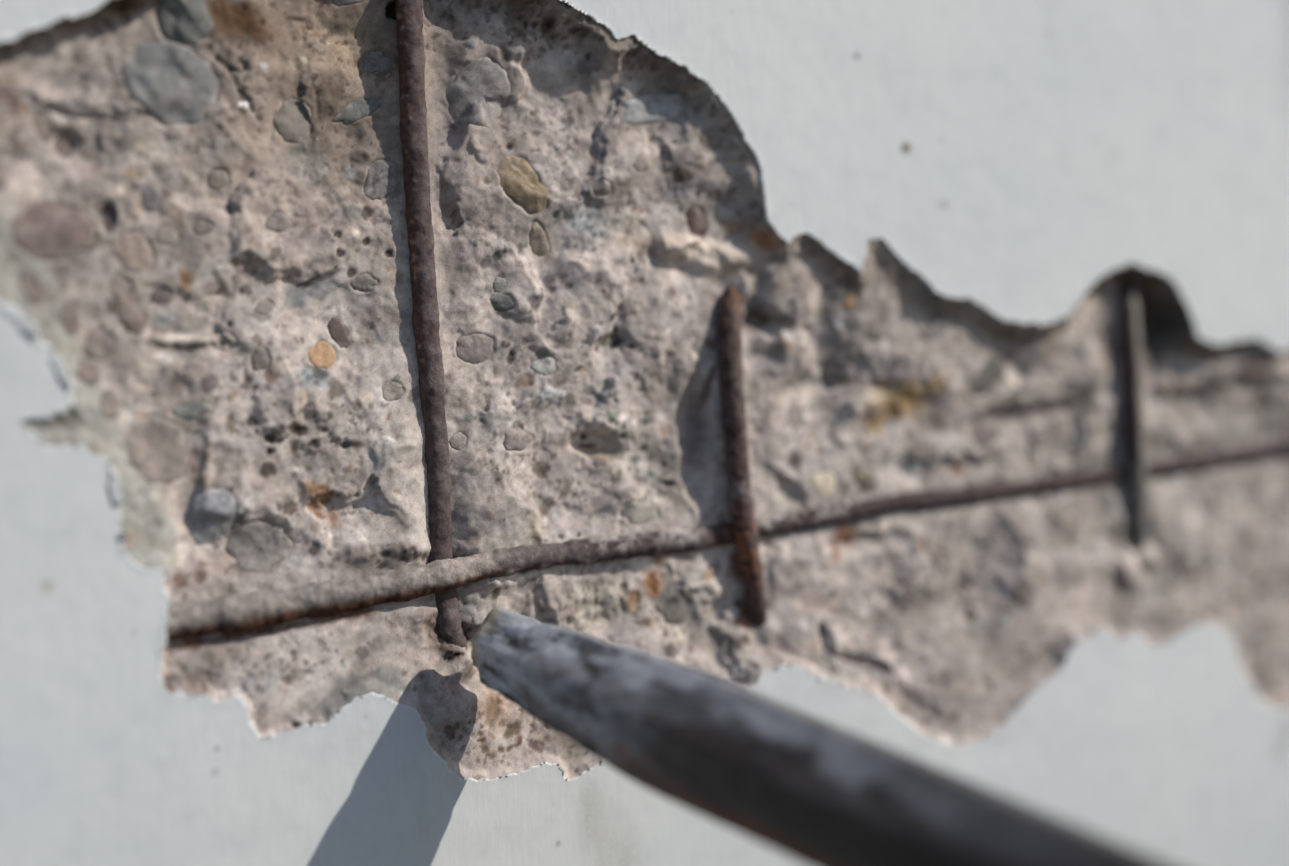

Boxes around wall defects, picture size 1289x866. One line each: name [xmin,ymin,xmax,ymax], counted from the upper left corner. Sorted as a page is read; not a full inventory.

spalling [0,0,1289,642]
rust [226,608,372,639]
rust [628,556,663,603]
spalling [160,439,1289,780]